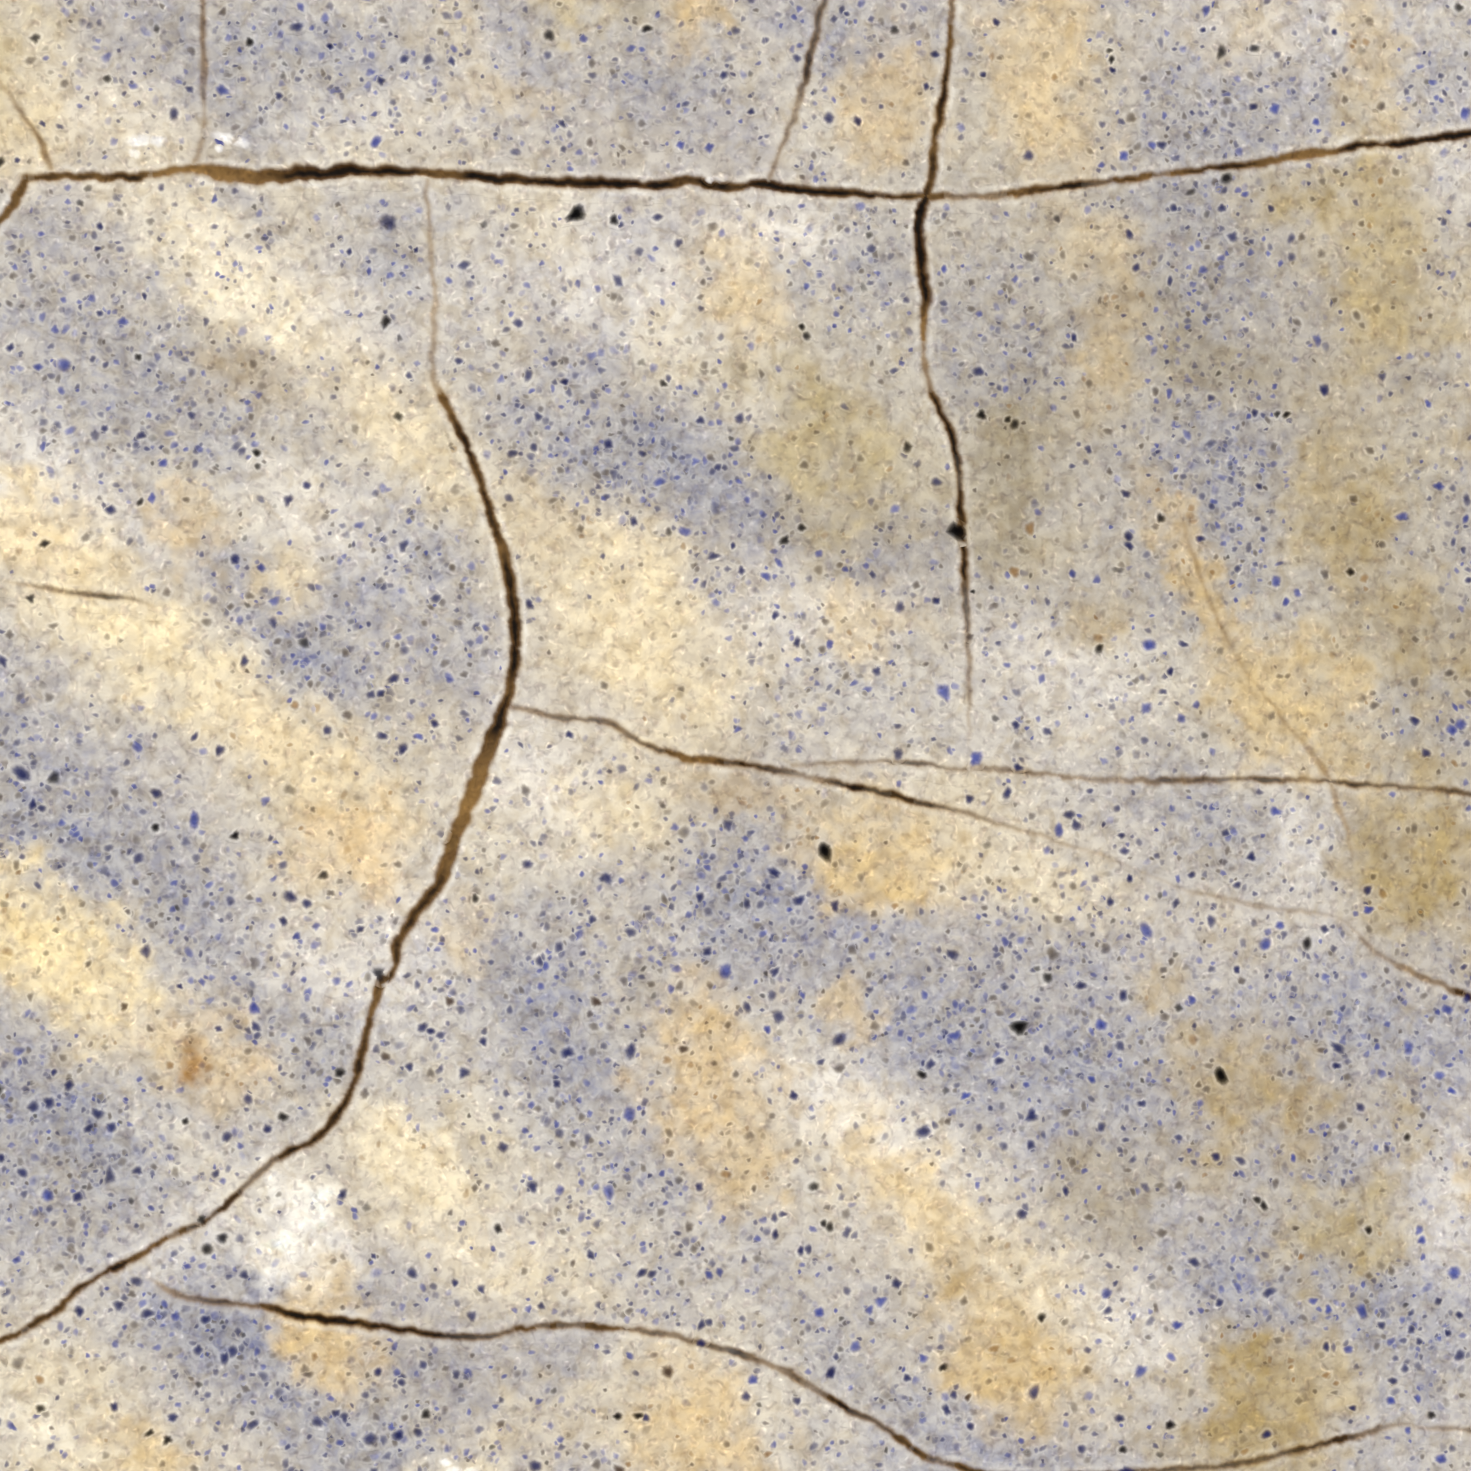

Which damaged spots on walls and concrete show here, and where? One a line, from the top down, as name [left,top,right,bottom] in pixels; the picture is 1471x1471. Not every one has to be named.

crack [0,0,1471,1012]
crack [0,375,1471,1471]